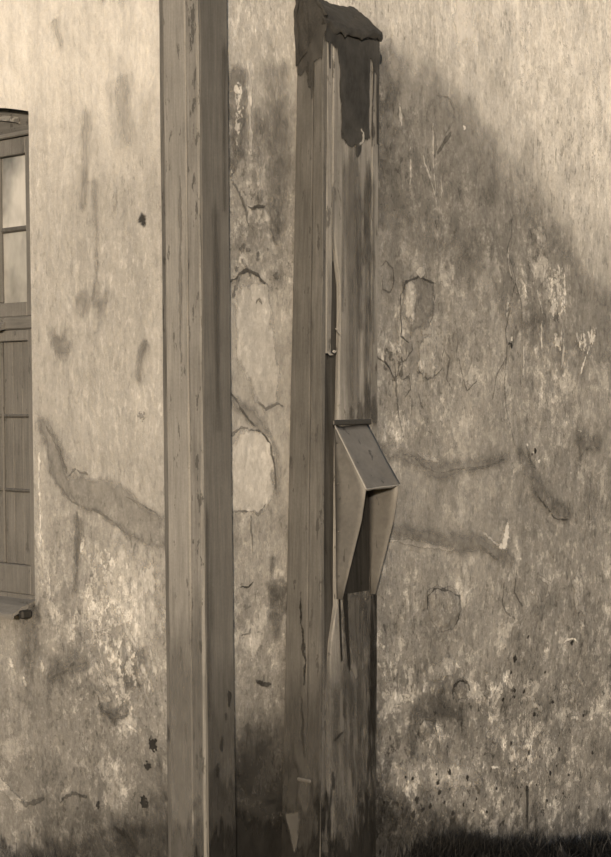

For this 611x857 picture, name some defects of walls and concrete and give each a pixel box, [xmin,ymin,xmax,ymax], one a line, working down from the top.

peeling [229,63,253,177]
crack [230,259,265,297]
crack [377,330,422,432]
crack [441,217,571,520]
peeling [524,264,566,368]
spalling [575,328,596,374]
crack [39,419,165,547]
crack [231,393,283,553]
spalling [484,522,510,549]
leakage [13,582,608,857]